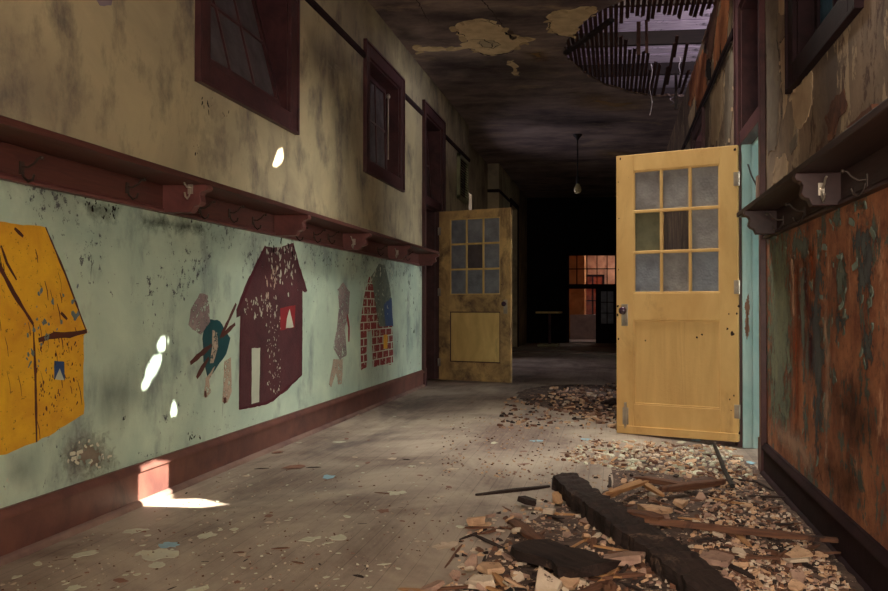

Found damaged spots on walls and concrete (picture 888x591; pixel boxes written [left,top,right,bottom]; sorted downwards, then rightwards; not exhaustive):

peeling [412,18,535,76]
peeling [543,6,598,39]
flaking render [765,0,813,183]
flaking render [824,89,848,140]
peeling [728,293,750,338]
peeling [766,200,878,467]